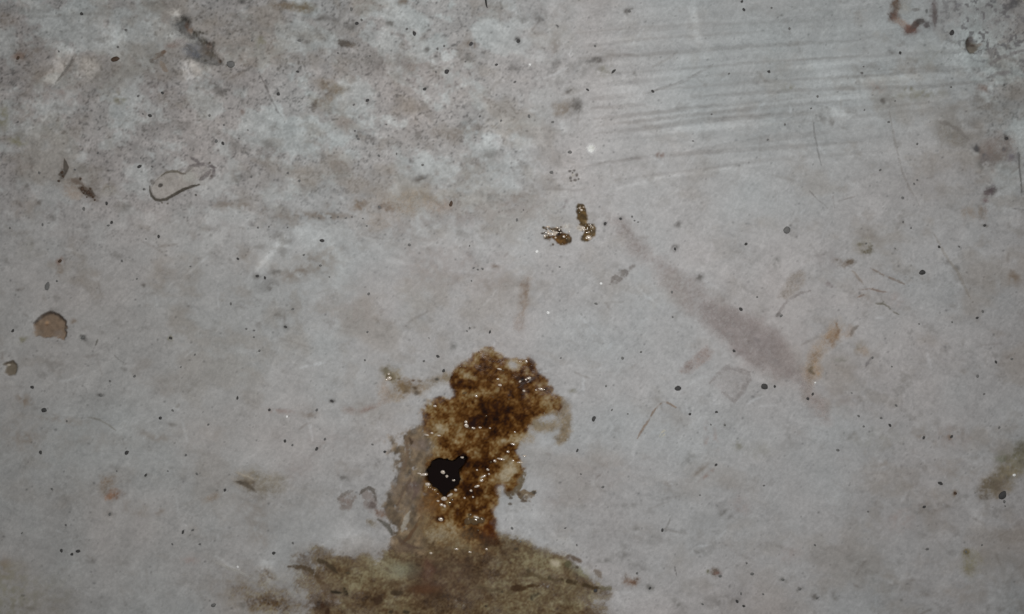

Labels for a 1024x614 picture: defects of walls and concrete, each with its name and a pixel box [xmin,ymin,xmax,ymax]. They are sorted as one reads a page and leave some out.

spalling [34,311,67,339]
leakage [288,347,611,614]
leakage [242,587,291,614]